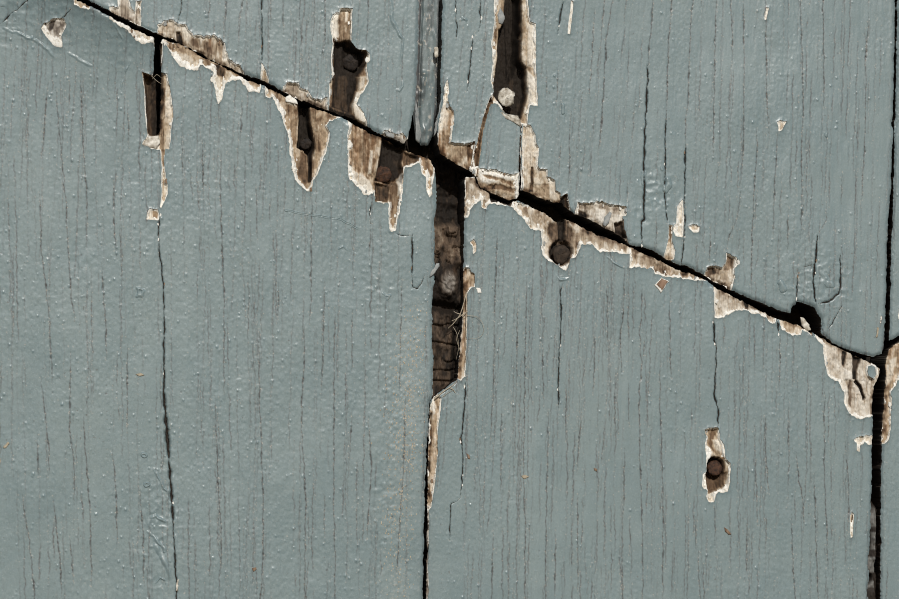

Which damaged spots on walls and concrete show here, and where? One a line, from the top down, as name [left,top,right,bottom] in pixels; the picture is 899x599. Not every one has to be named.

peeling [41,18,66,47]
peeling [108,0,269,149]
peeling [279,82,367,130]
peeling [378,80,629,245]
crack [627,1,777,263]
crack [709,176,863,329]
crack [157,213,177,599]
peeling [422,393,441,599]
crack [449,379,466,531]
crack [490,284,581,455]
crack [711,321,719,427]
peeling [694,253,899,452]